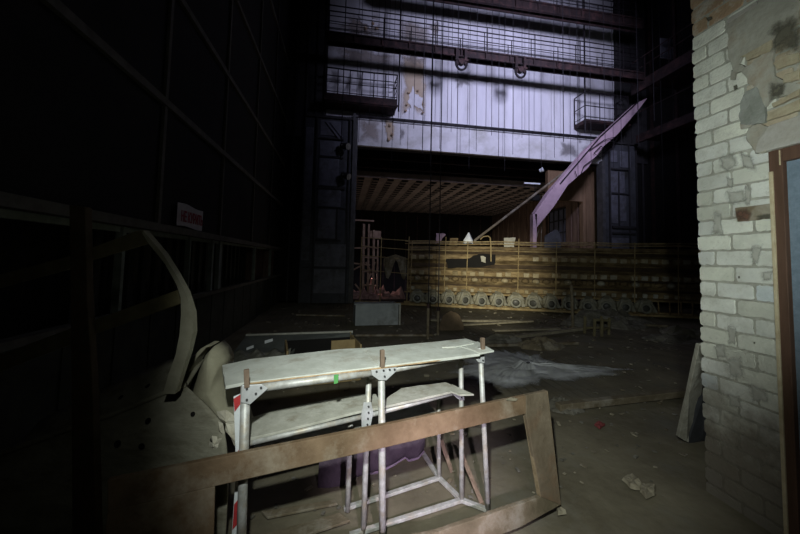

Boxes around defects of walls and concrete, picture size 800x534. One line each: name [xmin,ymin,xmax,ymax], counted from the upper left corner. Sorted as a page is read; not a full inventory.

peeling [404,60,425,113]
flaking render [727,0,800,154]